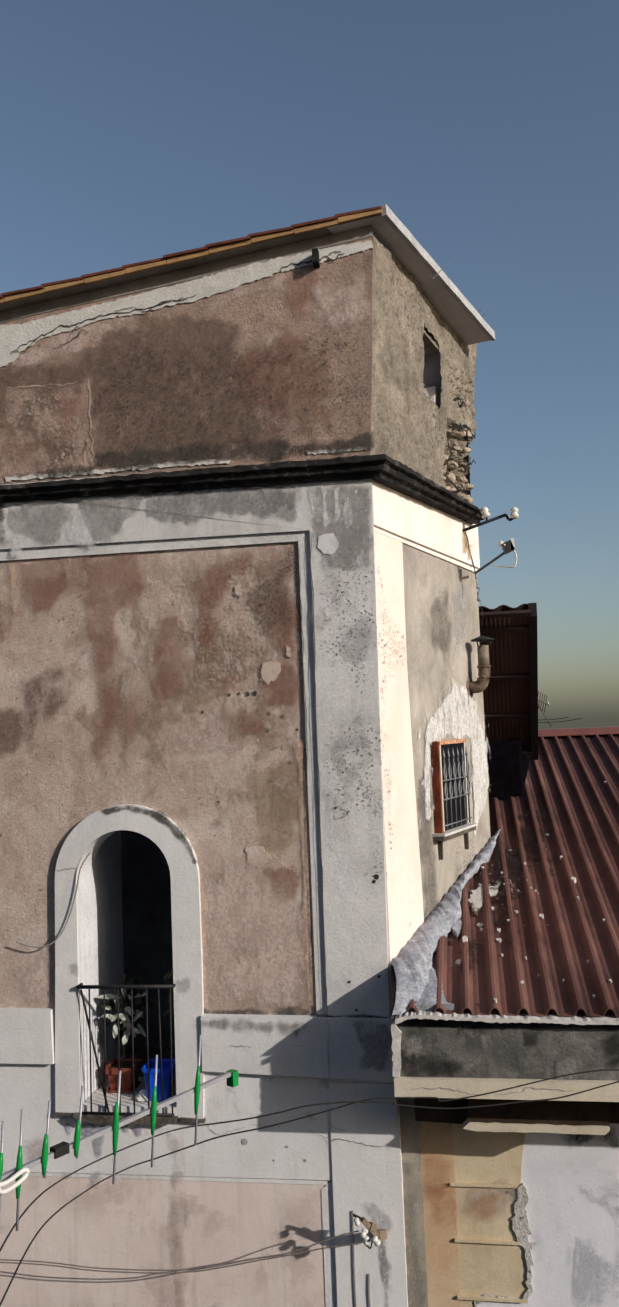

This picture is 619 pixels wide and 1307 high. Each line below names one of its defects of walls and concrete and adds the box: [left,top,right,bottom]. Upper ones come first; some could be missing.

crack [280,251,345,270]
damp [0,274,374,478]
spalling [442,425,474,504]
damp [204,959,391,1070]
spalling [474,1183,536,1307]